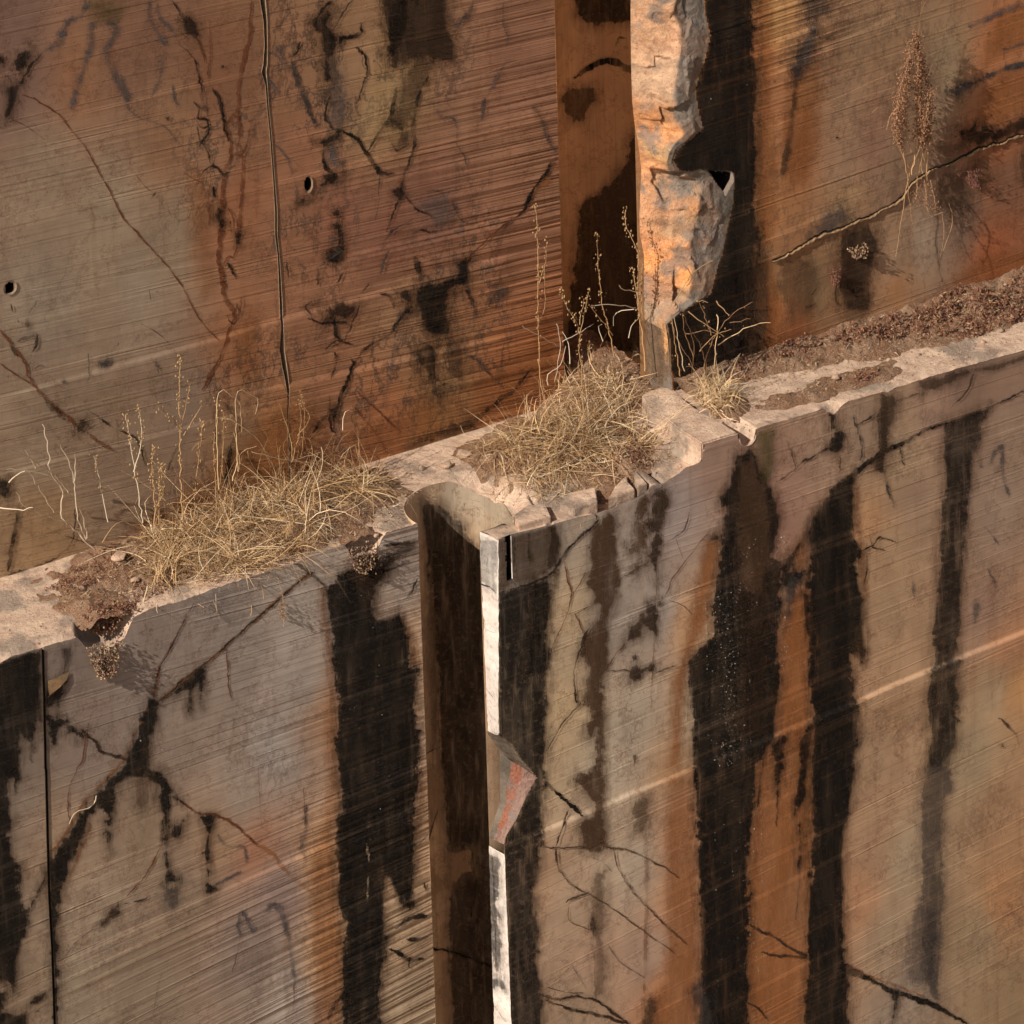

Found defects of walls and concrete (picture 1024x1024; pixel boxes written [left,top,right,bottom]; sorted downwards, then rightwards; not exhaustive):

crack [260,0,412,481]
water stain [378,0,460,73]
spalling [631,0,734,353]
water stain [668,0,768,391]
crack [772,133,1024,263]
water stain [0,649,184,1024]
crack [153,570,326,701]
water stain [325,504,560,1024]
crack [542,967,629,1024]
crack [545,790,687,953]
water stain [573,394,897,1024]
water stain [918,409,989,1000]